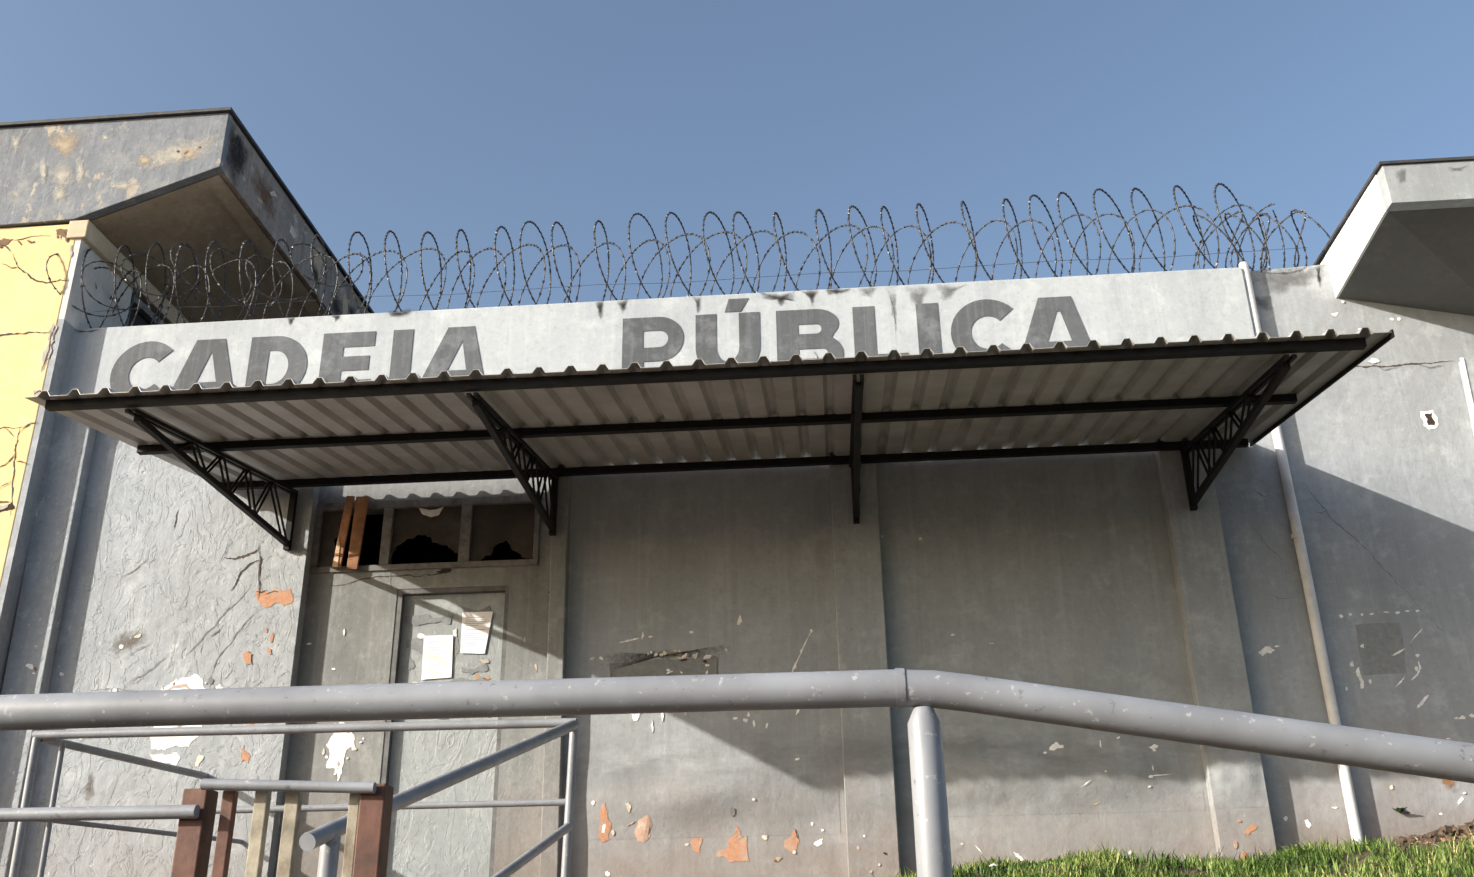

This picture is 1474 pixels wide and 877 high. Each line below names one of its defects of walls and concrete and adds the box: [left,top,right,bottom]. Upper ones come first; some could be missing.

crack [4,255,68,284]
crack [0,329,51,337]
crack [1356,361,1448,370]
hole [1420,410,1439,430]
crack [0,422,36,516]
crack [90,540,261,691]
flaking render [255,587,293,607]
peeling [161,674,222,690]
peeling [150,725,204,767]
peeling [322,722,365,781]
flaking render [591,801,652,843]
flaking render [685,807,824,862]